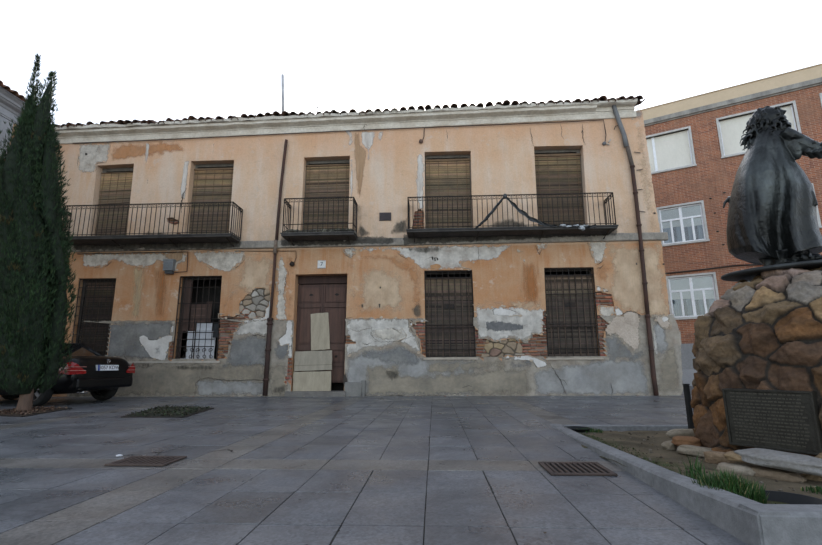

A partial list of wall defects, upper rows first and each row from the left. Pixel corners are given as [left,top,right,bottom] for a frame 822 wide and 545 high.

flaking render [77,142,110,172]
damp [346,131,382,193]
flaking render [81,250,245,271]
flaking render [343,244,525,271]
flaking render [139,322,174,361]
flaking render [215,257,293,385]
flaking render [346,304,426,357]
flaking render [473,304,548,369]
flaking render [595,285,640,356]